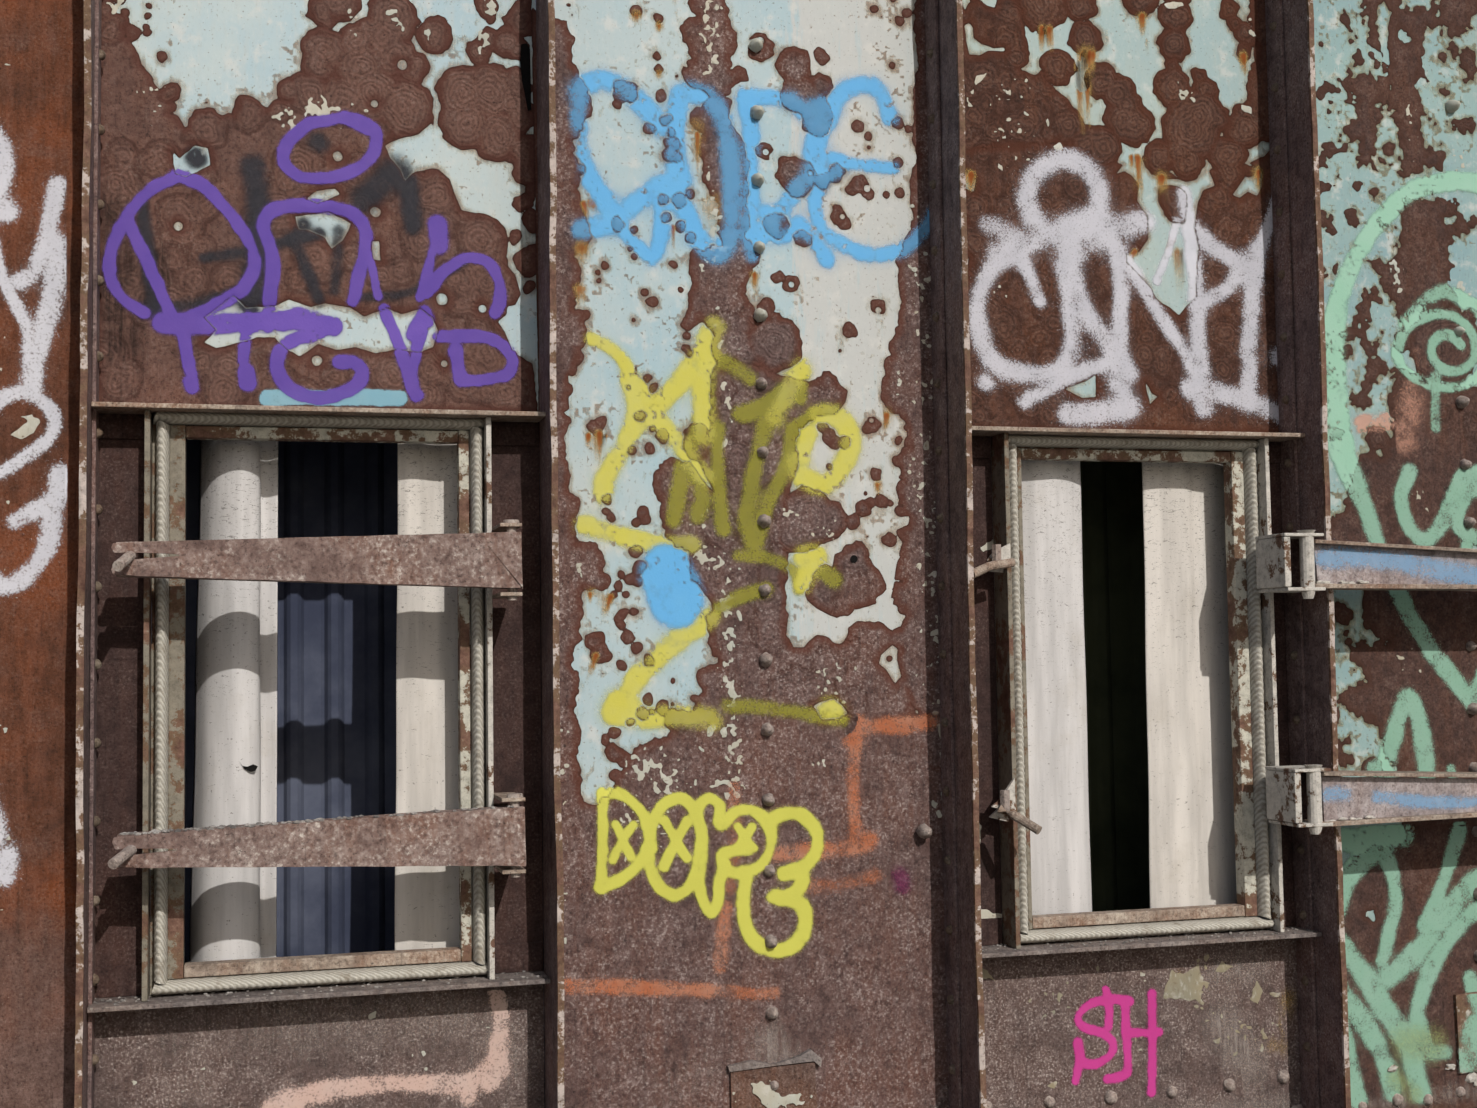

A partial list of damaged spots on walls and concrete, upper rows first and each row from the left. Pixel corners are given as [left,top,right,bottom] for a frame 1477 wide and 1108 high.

rust [1039,25,1053,44]
rust [1075,49,1096,110]
peeling [962,0,1279,433]
rust [1129,154,1166,187]
peeling [1316,0,1477,236]
peeling [1326,192,1477,548]
peeling [99,0,948,1108]
peeling [1316,580,1477,779]
peeling [1344,817,1477,1108]